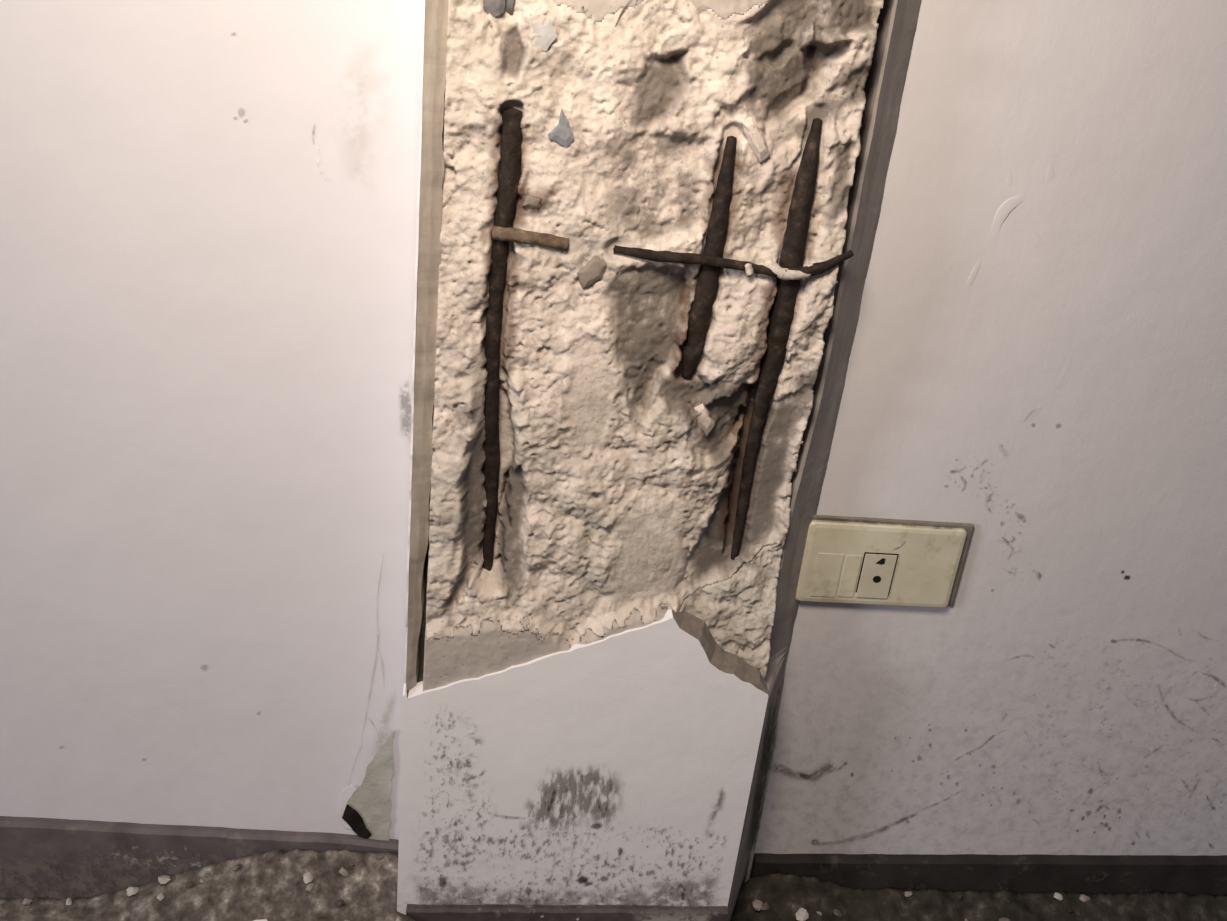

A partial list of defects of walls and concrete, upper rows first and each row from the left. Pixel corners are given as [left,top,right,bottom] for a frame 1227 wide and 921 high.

spalling [423,0,884,694]
leakage [423,714,485,853]